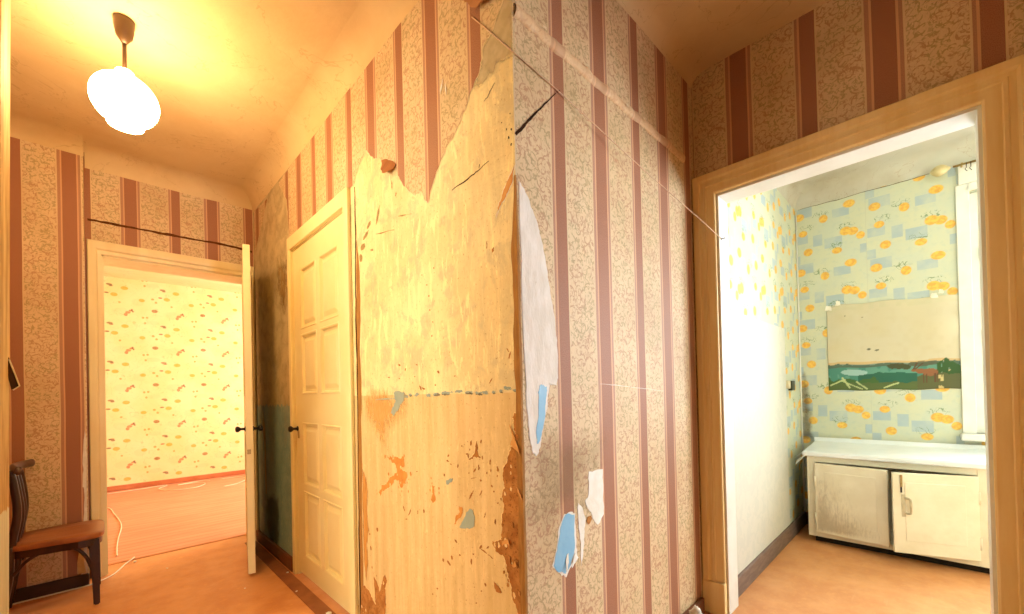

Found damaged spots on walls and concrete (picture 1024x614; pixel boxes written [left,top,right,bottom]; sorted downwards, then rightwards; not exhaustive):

crack [515,93,556,136]
flaking render [359,205,391,262]
damp [277,265,287,313]
peeling [376,364,516,416]
flaking render [379,412,522,614]
peeling [358,567,388,614]